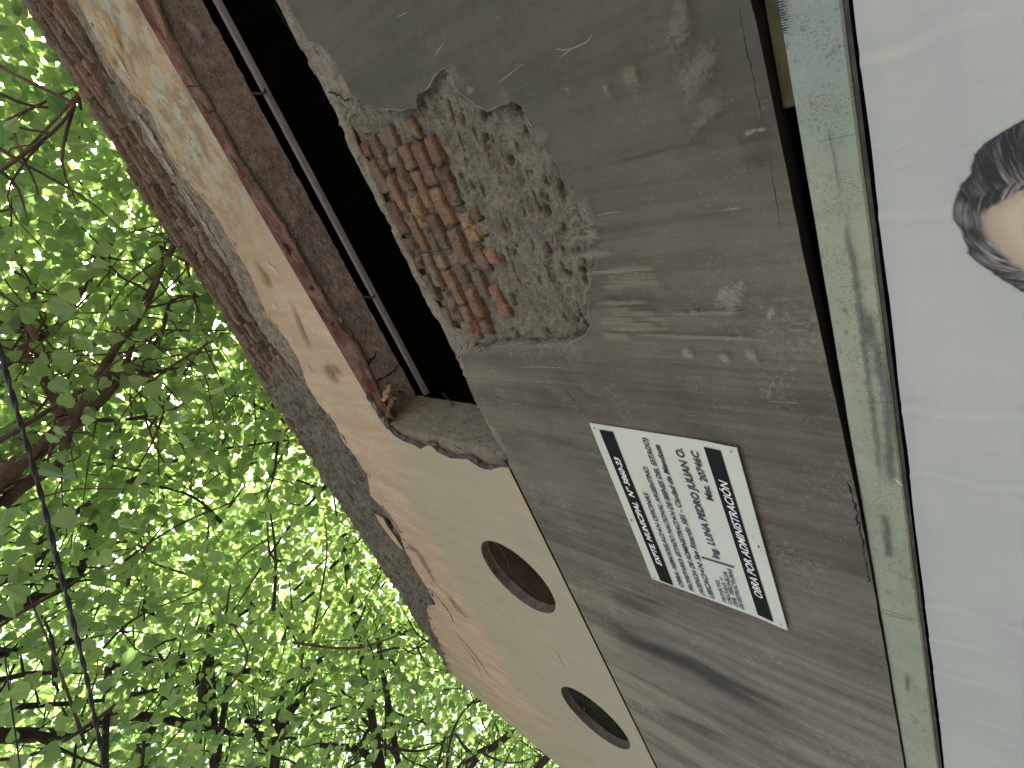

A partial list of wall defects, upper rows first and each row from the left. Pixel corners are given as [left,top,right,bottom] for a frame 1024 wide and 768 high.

spalling [21,0,452,674]
spalling [153,0,511,469]
spalling [335,67,598,375]
crack [738,4,762,114]